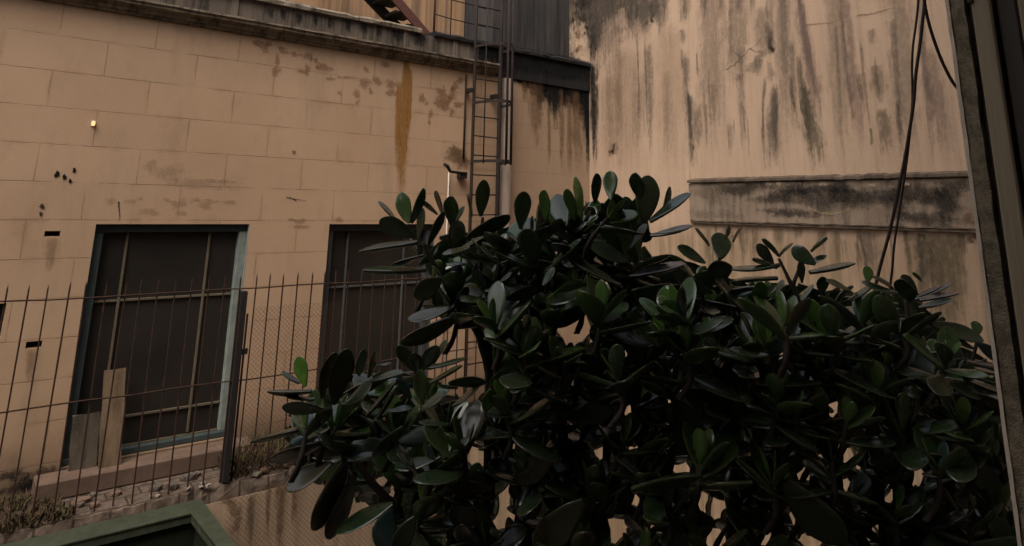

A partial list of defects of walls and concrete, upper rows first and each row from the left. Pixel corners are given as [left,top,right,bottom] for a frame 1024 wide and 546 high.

corrosion [395,61,412,183]
damp [478,0,665,162]
damp [762,85,778,146]
damp [791,0,820,155]
damp [715,181,965,308]